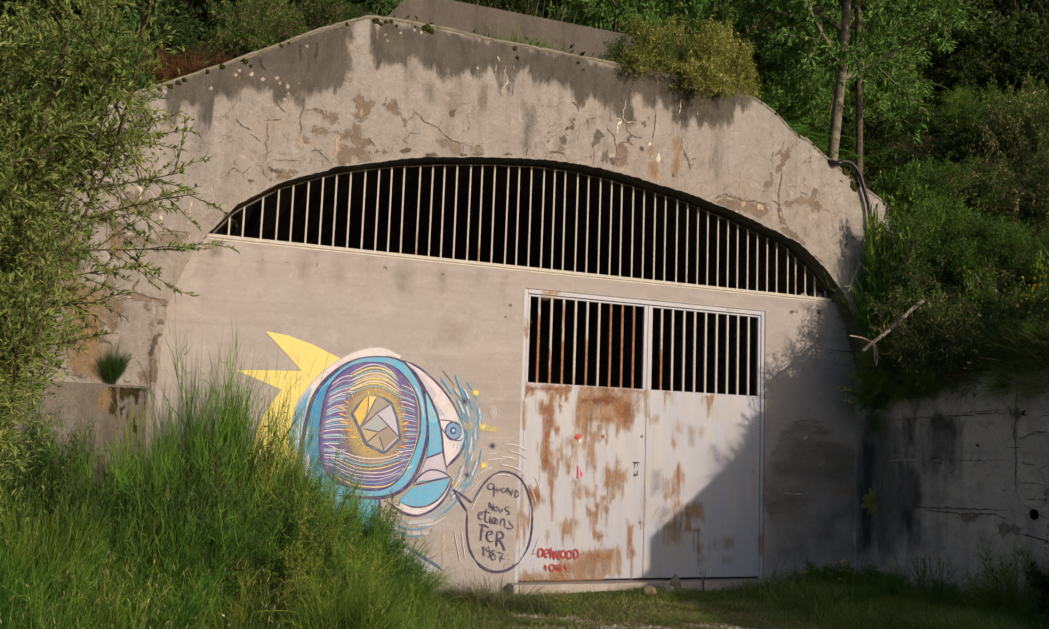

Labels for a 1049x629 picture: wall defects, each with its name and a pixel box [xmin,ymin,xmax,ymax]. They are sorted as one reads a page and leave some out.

leakage [138,24,353,125]
crack [228,96,329,178]
spalling [300,94,411,166]
leakage [371,21,751,132]
rust [516,384,646,581]
rust [665,465,703,532]
leakage [832,420,920,551]
crack [887,387,1049,541]